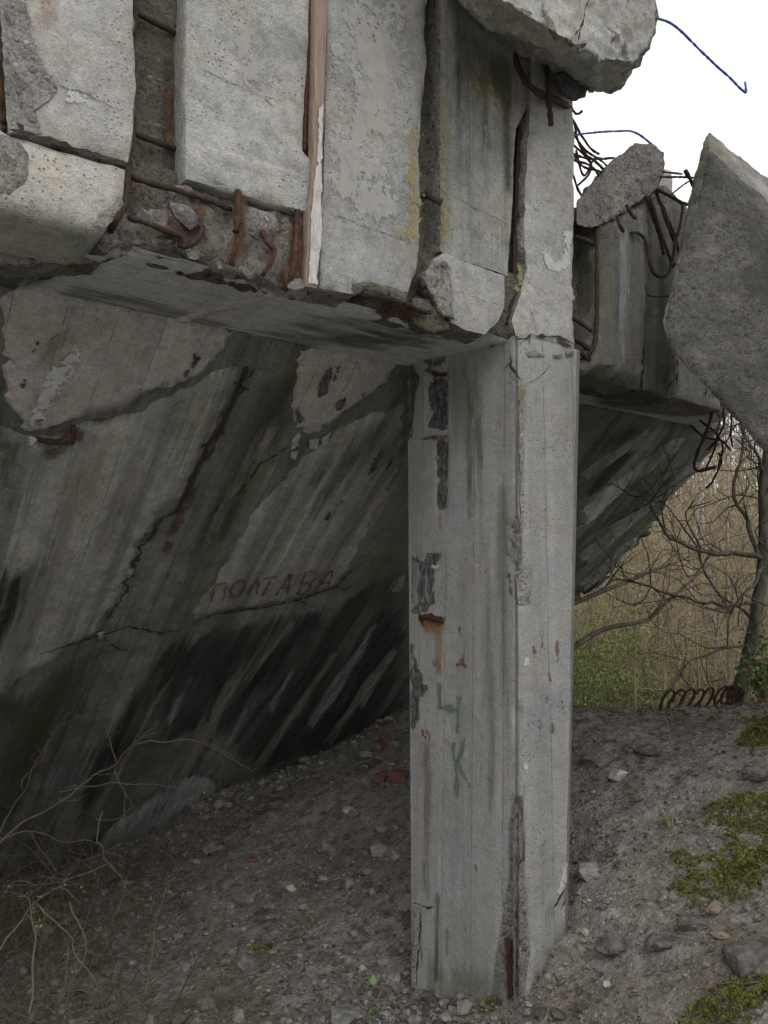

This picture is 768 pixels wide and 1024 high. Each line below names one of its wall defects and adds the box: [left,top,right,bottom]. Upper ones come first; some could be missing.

leakage [28,337,89,448]
flaking render [0,286,234,432]
peeling [413,367,447,430]
crack [44,369,364,653]
peeling [437,491,447,511]
leakage [0,570,26,646]
rust [418,613,444,641]
leakage [0,663,86,819]
leakage [82,578,407,853]
spalling [493,804,530,1007]